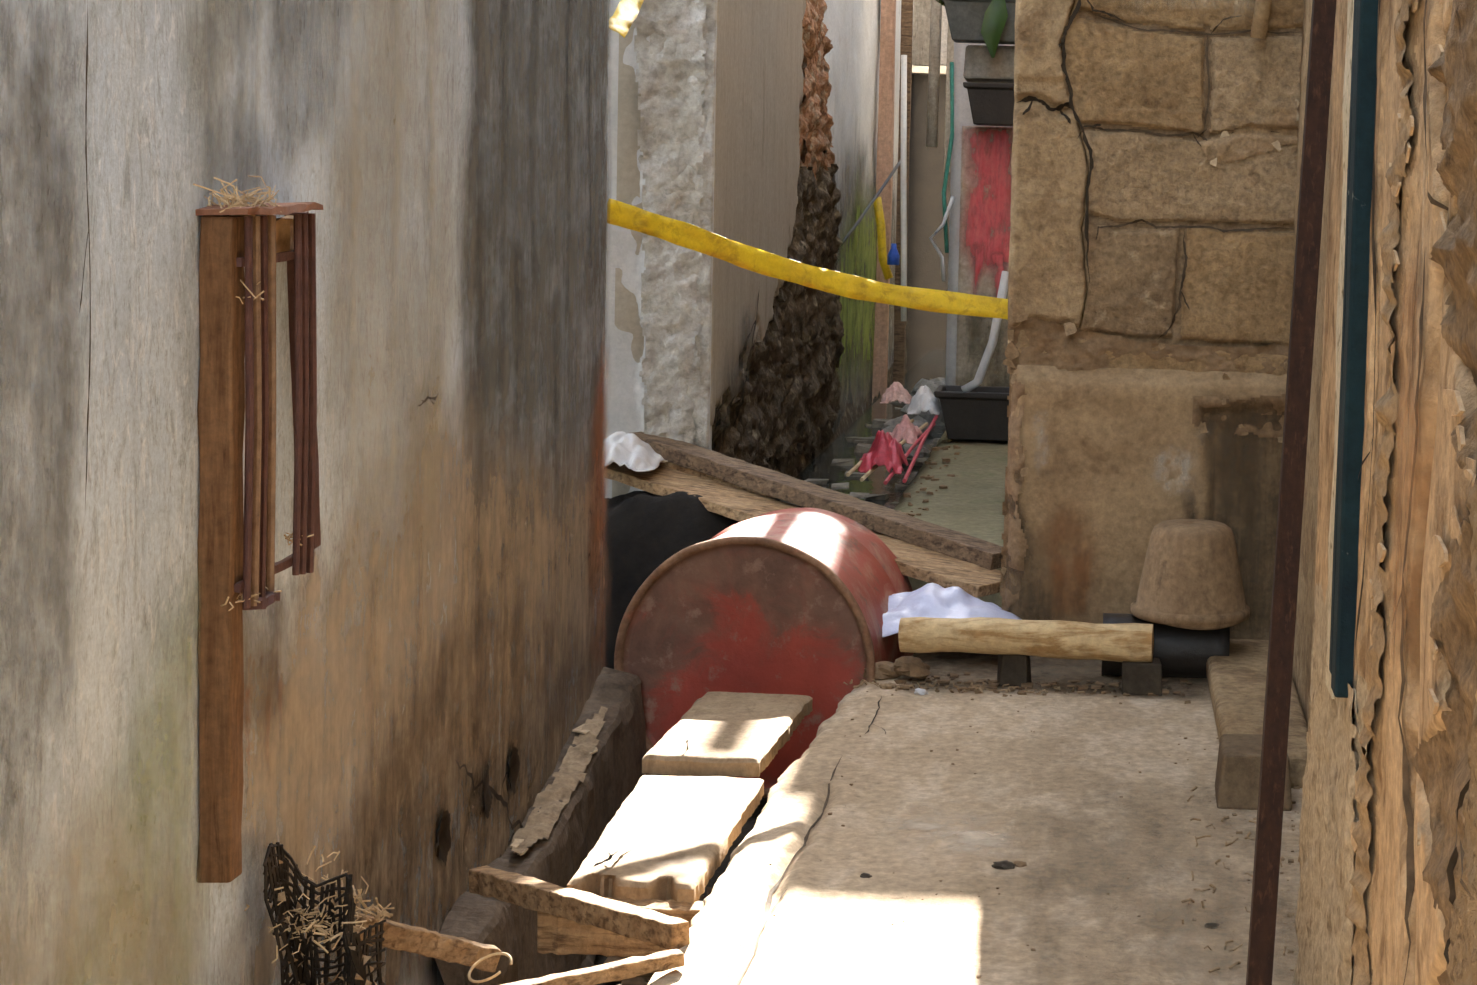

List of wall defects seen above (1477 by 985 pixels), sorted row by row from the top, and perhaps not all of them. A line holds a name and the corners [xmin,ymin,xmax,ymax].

leakage [0,15,75,841]
leakage [242,0,610,985]
spalling [639,233,702,443]
spalling [633,0,709,227]
spalling [799,0,834,163]
crack [1017,0,1299,340]
peeling [1293,0,1477,985]
crack [736,697,886,985]